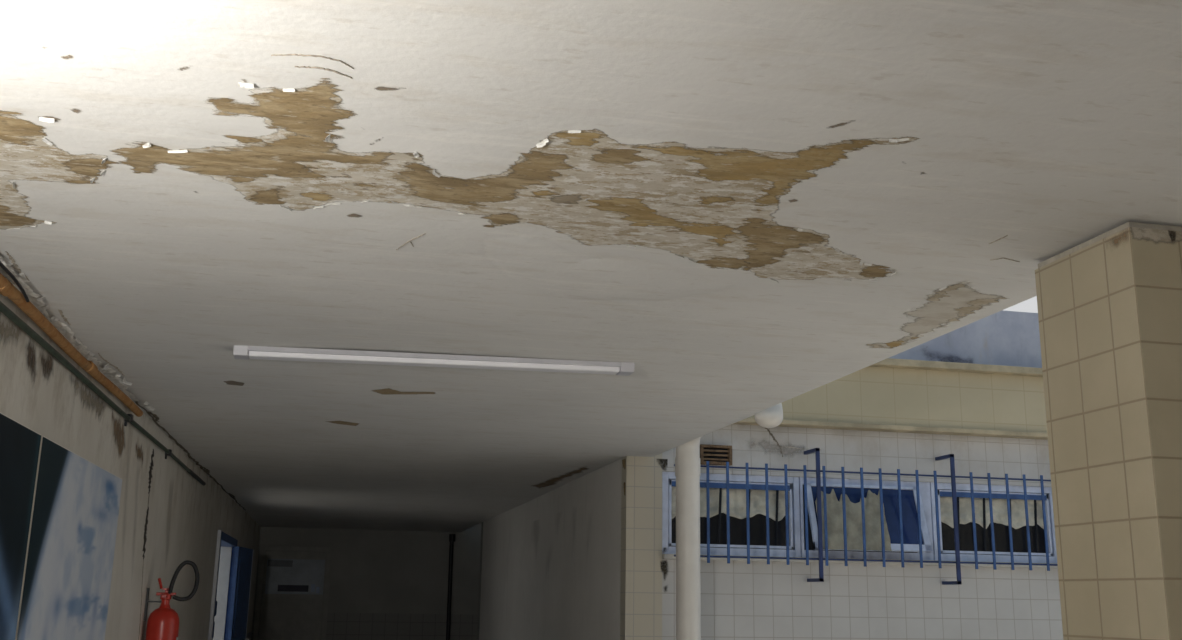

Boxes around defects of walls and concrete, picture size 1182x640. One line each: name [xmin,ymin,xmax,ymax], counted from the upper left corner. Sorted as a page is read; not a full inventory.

peeling [0,78,919,283]
water stain [0,321,53,378]
spalling [0,251,155,411]
water stain [75,381,143,461]
peeling [867,282,1006,348]
crack [135,401,245,640]